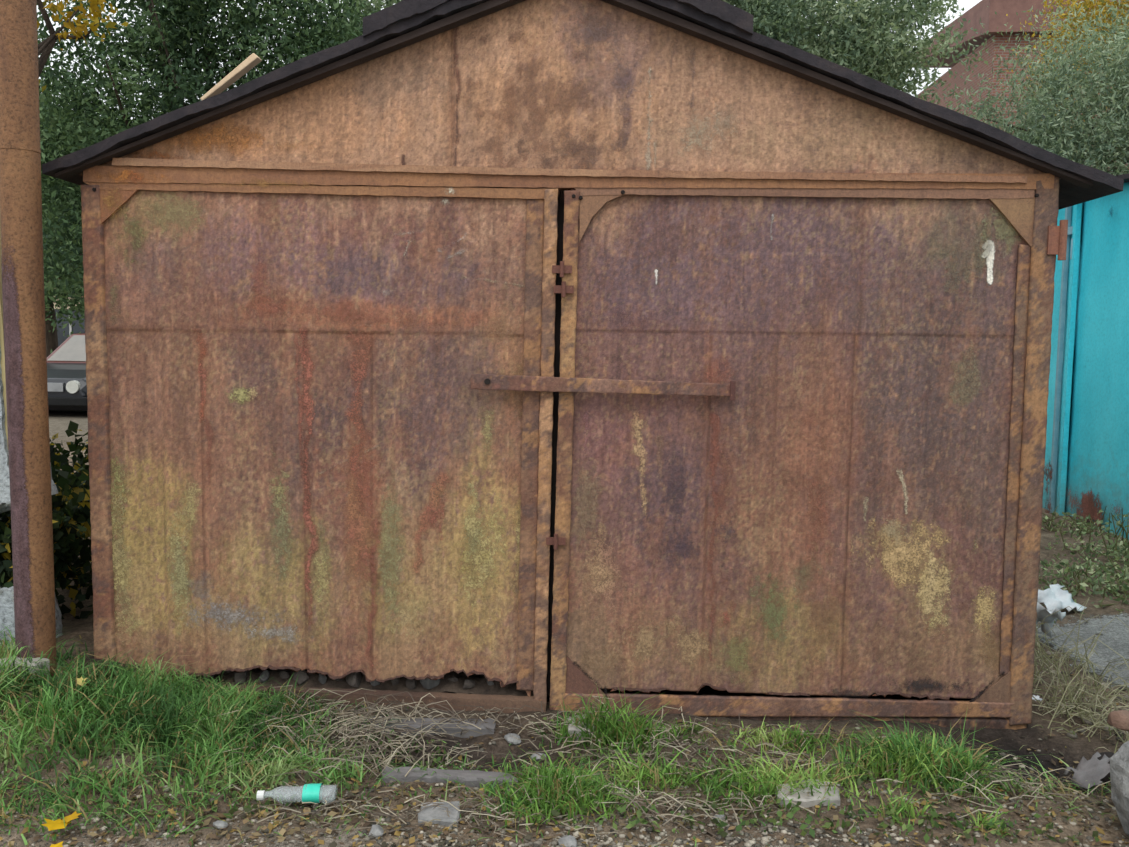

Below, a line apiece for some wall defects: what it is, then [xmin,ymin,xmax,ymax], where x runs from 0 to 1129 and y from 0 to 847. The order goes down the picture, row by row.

rust [294,328,320,624]
rust [631,411,647,513]
rust [1067,488,1121,531]